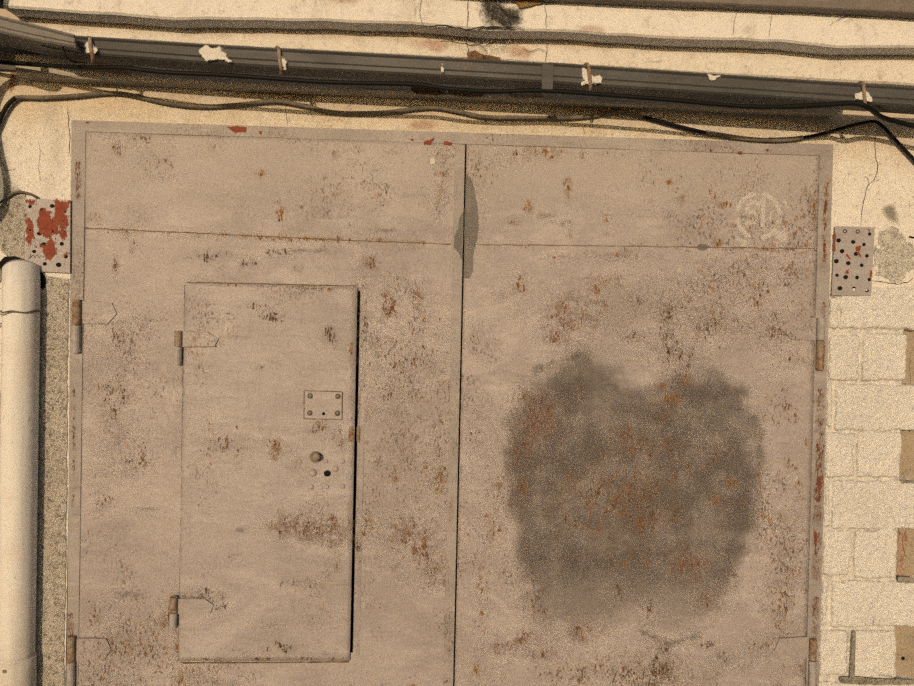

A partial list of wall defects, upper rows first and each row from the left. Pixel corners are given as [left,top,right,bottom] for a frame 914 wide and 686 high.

crack [415,2,556,60]
crack [834,131,878,219]
corrosion [537,247,789,384]
corrosion [349,286,451,493]
corrosion [506,379,739,567]
corrosion [755,388,826,580]
corrosion [271,509,379,552]
corrosion [386,506,445,590]
peeling [896,532,909,577]
corrosion [492,574,551,655]
corrosion [531,622,690,686]
corrosion [747,547,803,651]